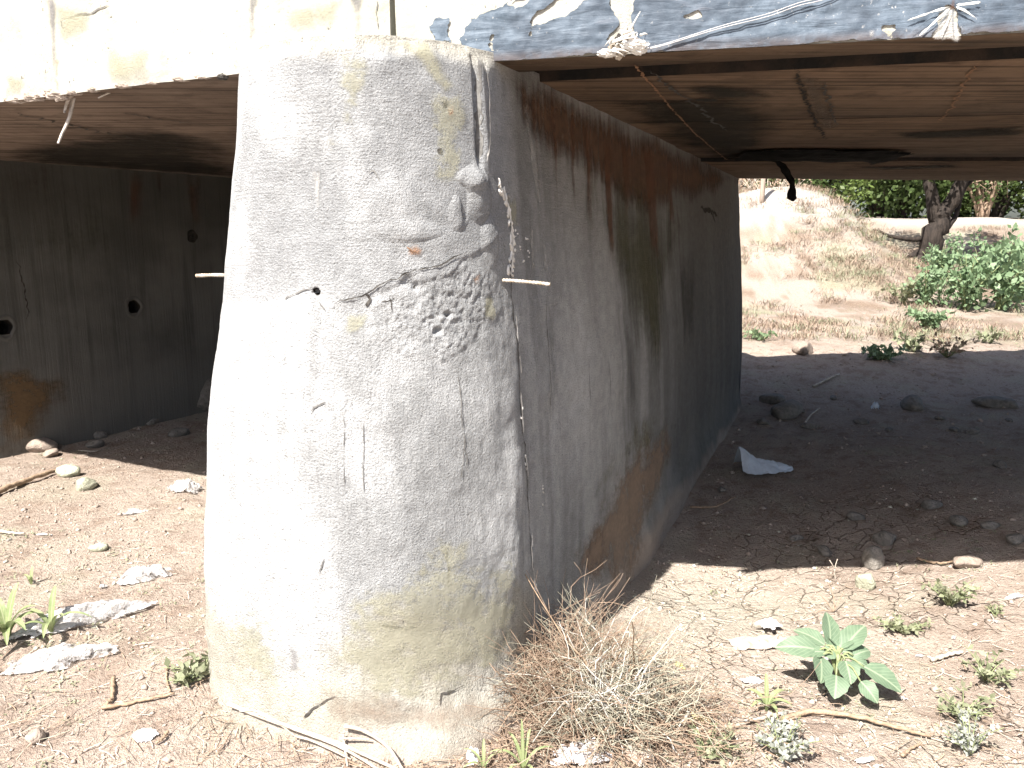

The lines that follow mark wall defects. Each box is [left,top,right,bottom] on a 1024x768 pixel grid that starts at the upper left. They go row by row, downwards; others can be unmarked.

spalling [909,1,980,40]
crack [284,254,461,310]
crack [498,178,544,592]